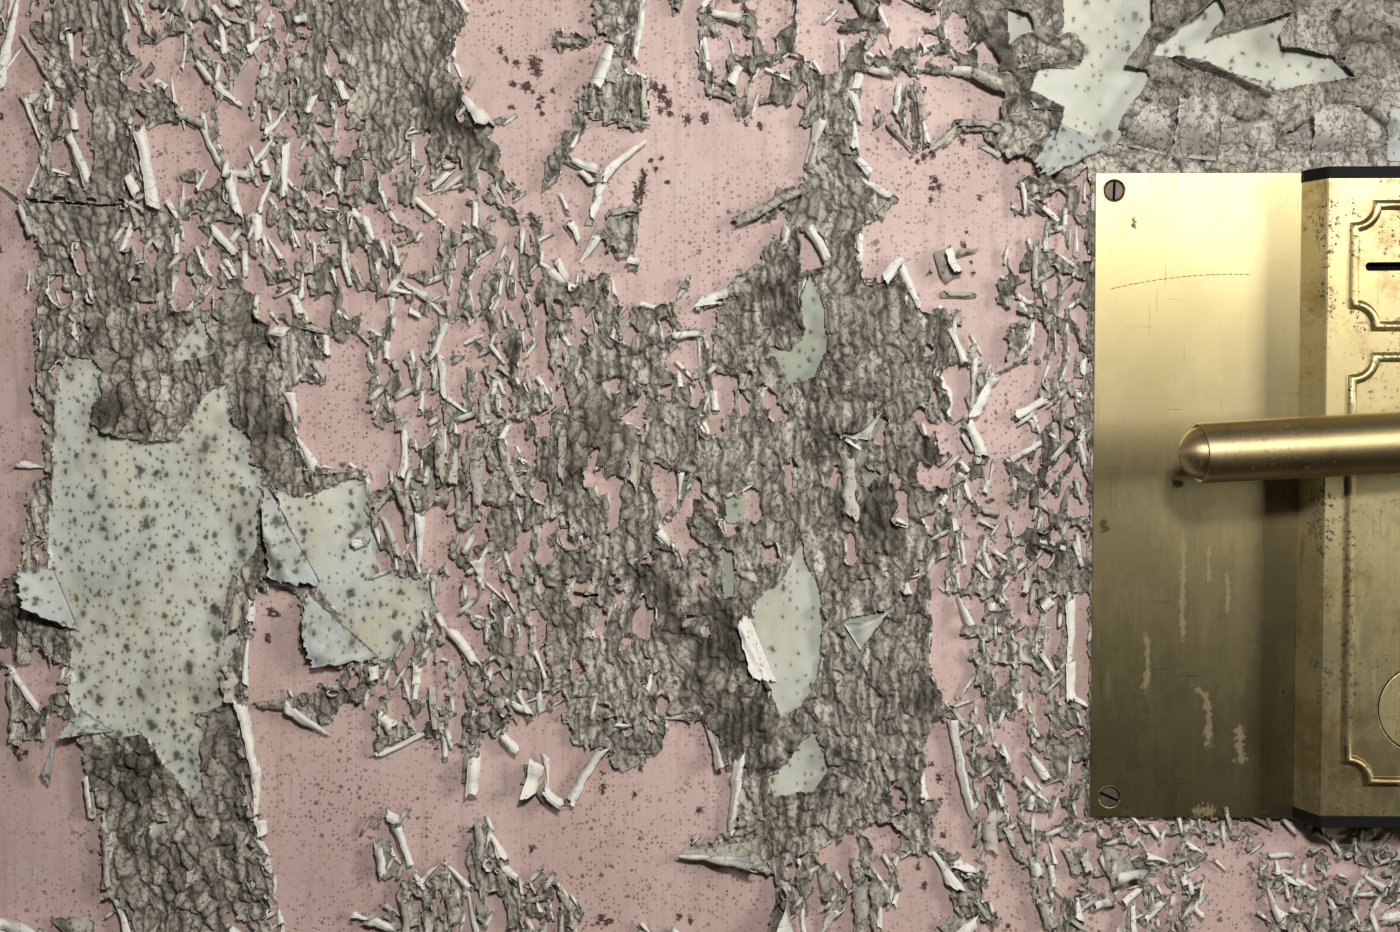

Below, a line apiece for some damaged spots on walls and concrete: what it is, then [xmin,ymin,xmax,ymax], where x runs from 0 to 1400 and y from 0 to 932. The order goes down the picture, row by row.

peeling [0,0,539,932]
peeling [350,805,585,932]
peeling [436,0,1400,932]